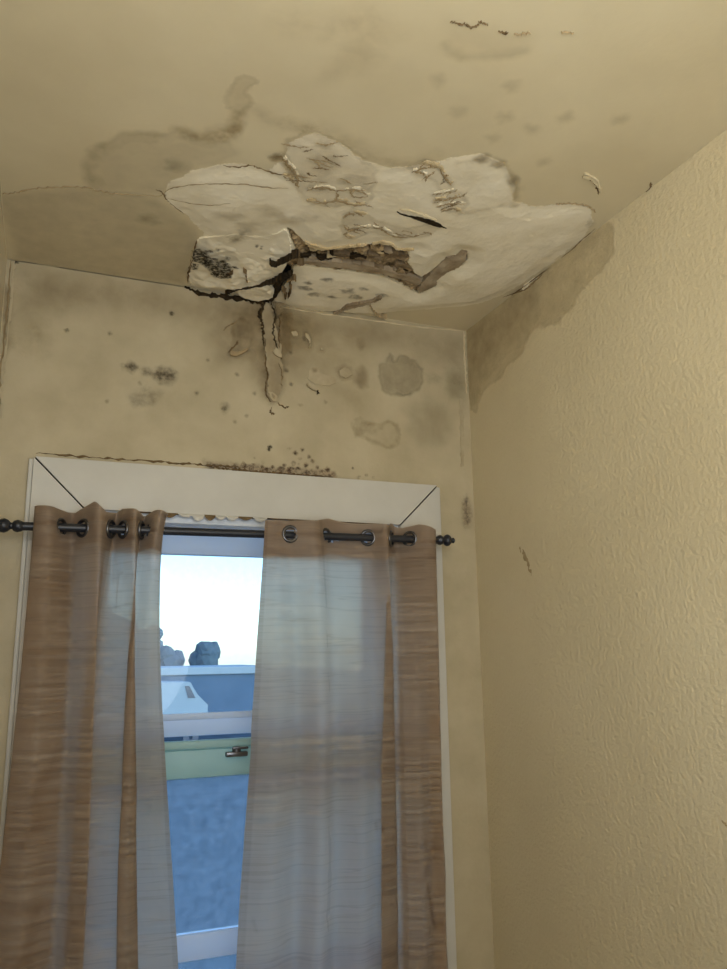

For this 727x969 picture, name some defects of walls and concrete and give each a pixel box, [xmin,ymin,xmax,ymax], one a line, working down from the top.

leakage [192,249,239,279]
crack [0,241,467,467]
peeling [157,132,594,319]
leakage [39,449,333,477]